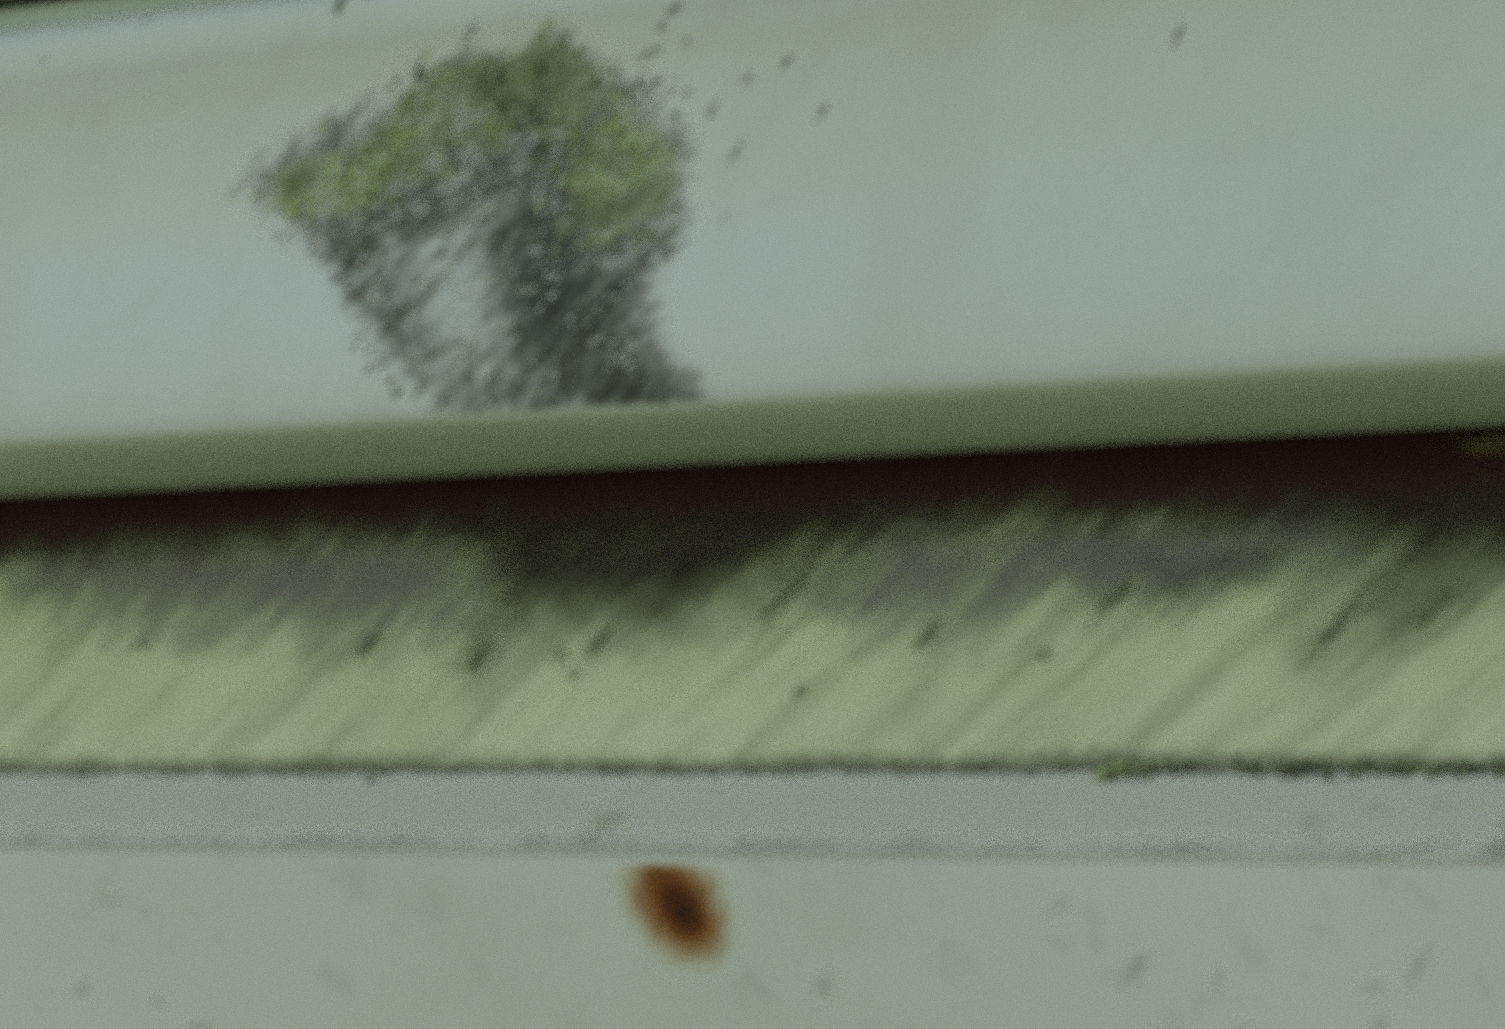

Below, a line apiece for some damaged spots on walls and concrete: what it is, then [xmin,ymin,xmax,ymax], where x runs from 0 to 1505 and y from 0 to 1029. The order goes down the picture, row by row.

leakage [261,37,701,414]
leakage [0,425,1505,651]
rust [633,865,720,956]